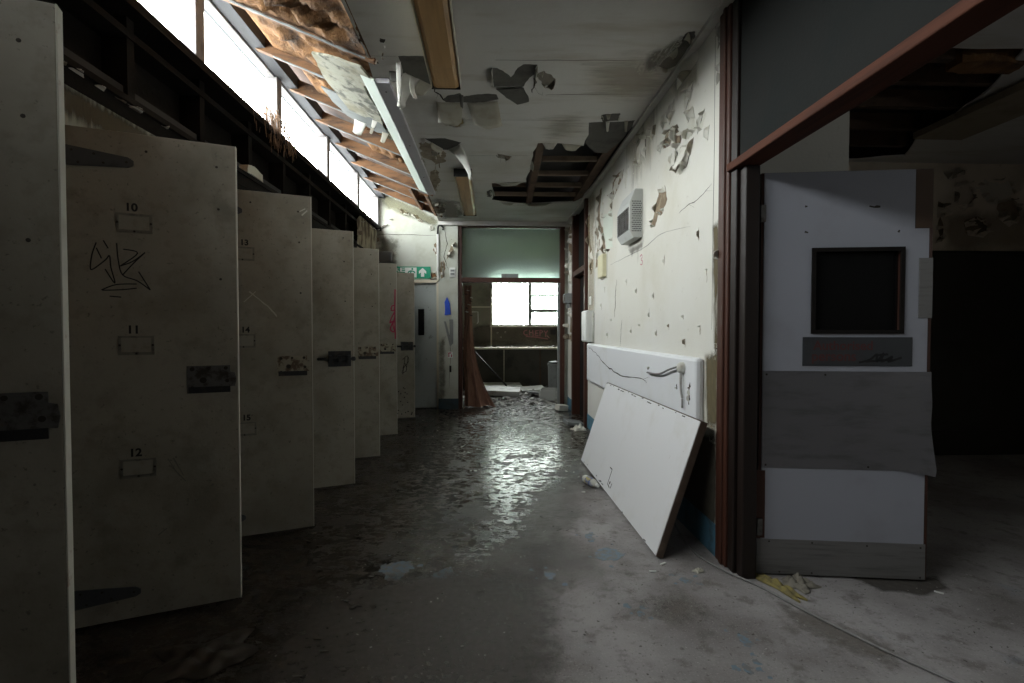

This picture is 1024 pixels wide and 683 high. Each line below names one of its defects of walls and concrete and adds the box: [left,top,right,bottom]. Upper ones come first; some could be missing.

peeling [380,56,556,279]
peeling [585,81,710,275]
crack [614,186,714,342]